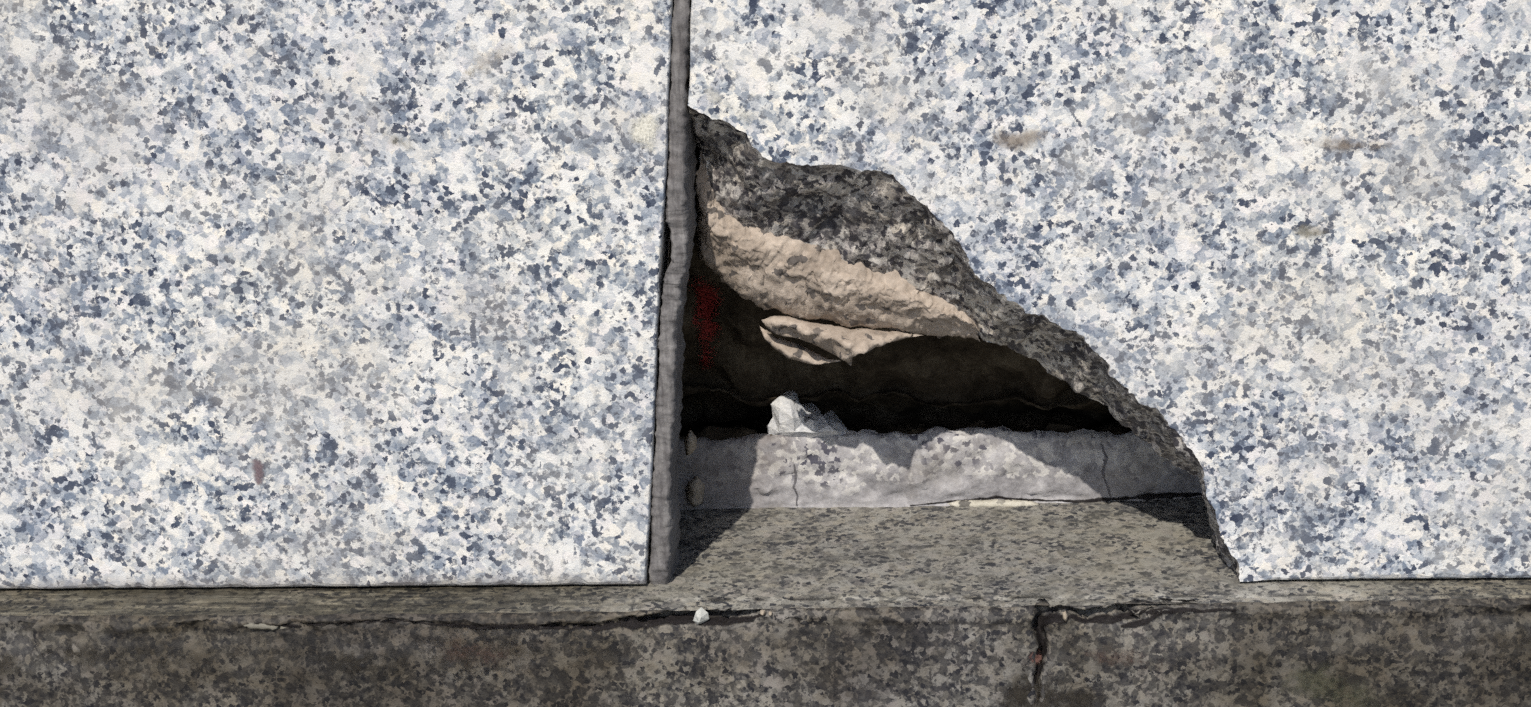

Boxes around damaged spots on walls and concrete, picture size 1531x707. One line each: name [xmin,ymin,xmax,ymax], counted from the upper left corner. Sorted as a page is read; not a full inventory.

spalling [688,106,1240,581]
crack [238,614,765,632]
crack [1034,607,1236,706]